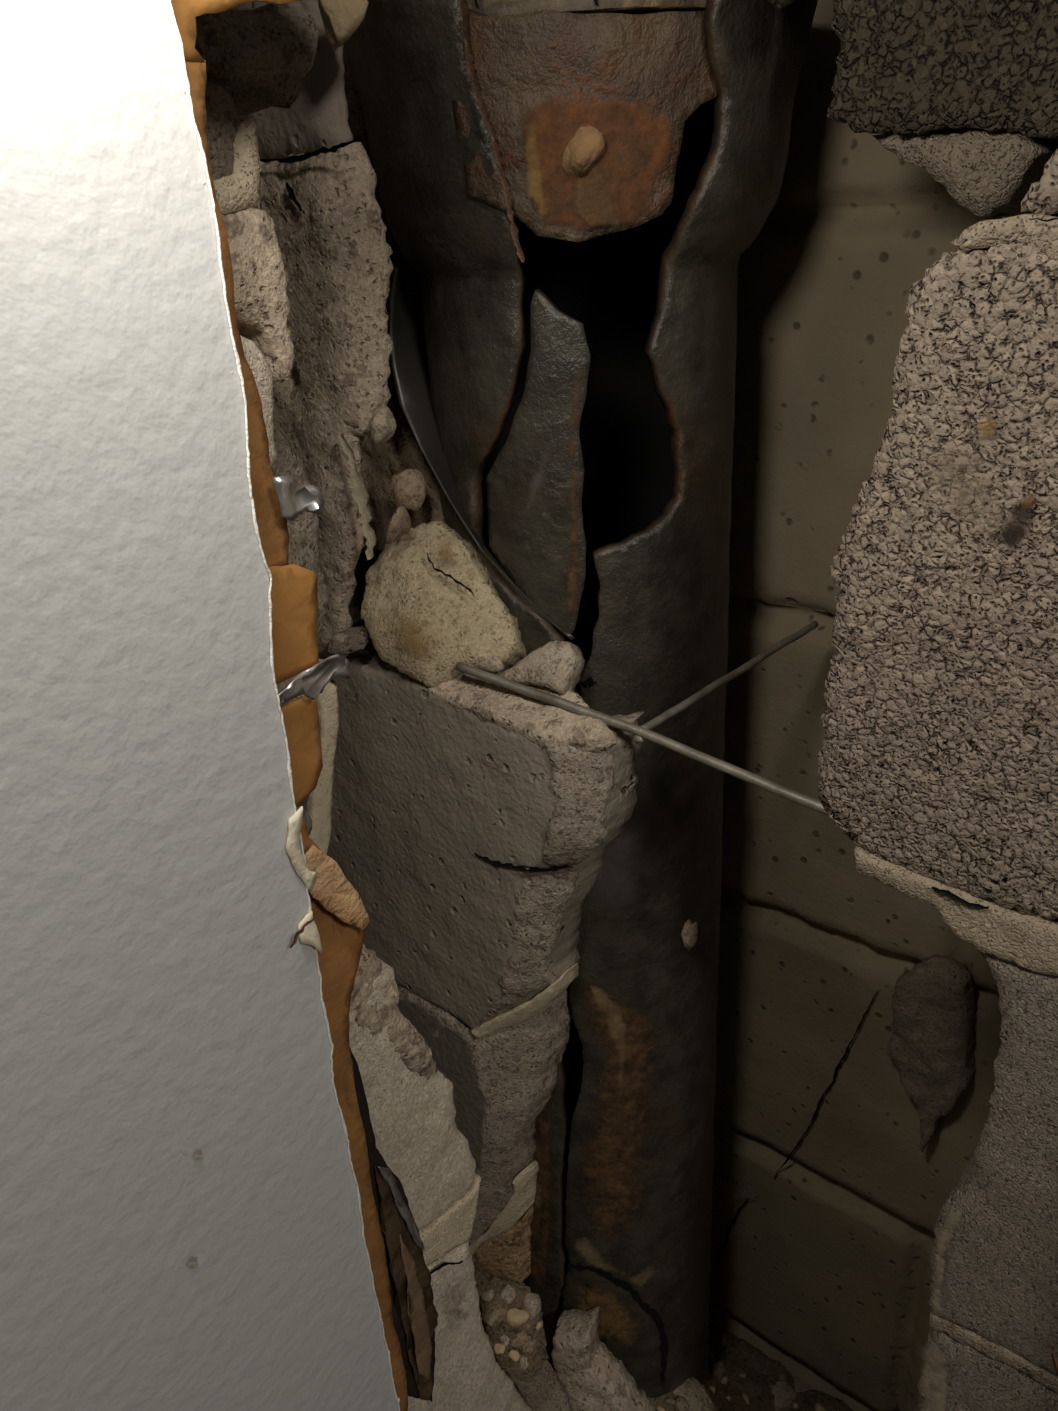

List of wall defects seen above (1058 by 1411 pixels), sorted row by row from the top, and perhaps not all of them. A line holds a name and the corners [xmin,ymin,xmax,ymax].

corrosion [523,98,669,226]
spalling [421,670,616,1023]
spalling [349,943,486,1168]
crack [774,991,878,1178]